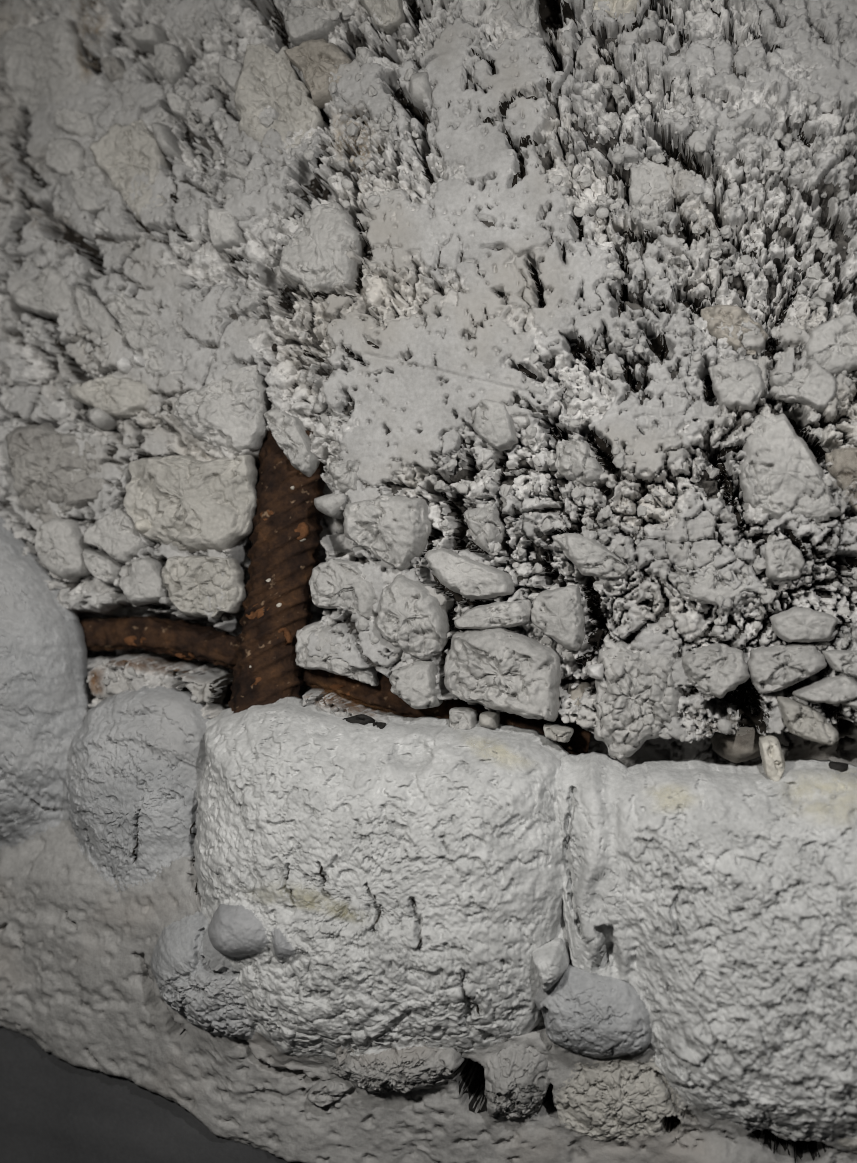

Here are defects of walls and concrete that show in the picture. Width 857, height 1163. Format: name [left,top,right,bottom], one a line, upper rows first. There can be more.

spalling [79,430,591,755]